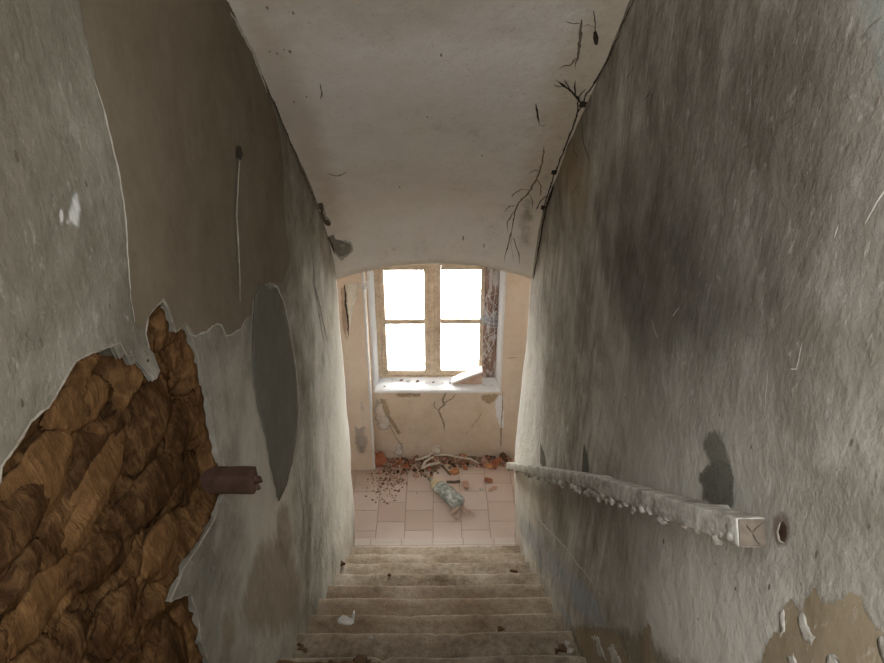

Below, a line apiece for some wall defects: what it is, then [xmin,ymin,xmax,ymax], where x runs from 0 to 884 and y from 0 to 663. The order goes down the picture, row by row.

crack [504,0,634,279]
flaking render [318,203,353,260]
flaking render [0,0,291,663]
crack [433,393,455,431]
flaking render [570,623,669,663]
flaking render [762,588,884,663]